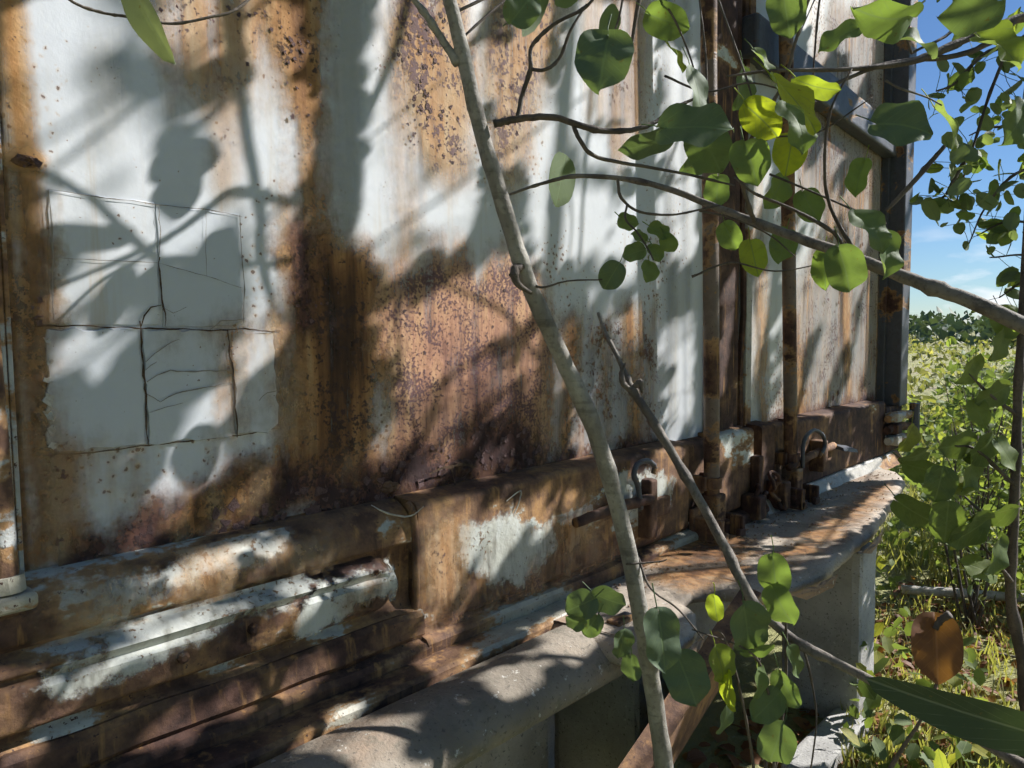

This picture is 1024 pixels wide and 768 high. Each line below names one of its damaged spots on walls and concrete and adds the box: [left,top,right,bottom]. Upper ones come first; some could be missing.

rust [808,36,885,109]
rust [797,111,882,256]
crack [36,189,284,455]
rust [0,0,593,566]
rust [561,292,664,451]
rust [758,266,783,422]
rust [796,256,880,414]
peeling [44,527,398,699]
rust [423,520,468,611]
peeling [458,490,558,588]